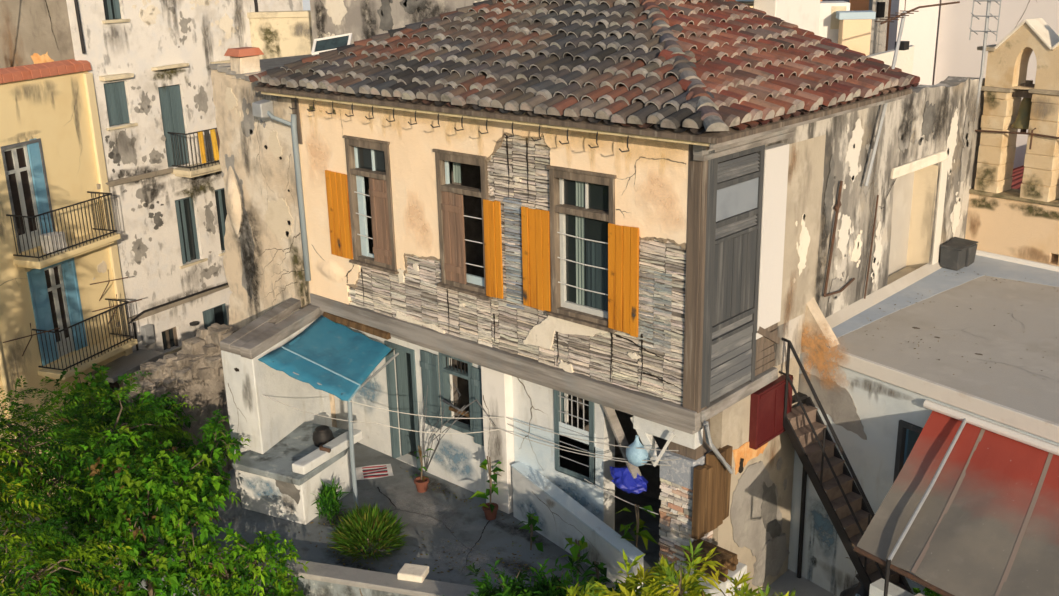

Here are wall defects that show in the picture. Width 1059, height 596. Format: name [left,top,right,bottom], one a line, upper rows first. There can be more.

peeling [317,0,347,38]
peeling [372,0,432,31]
water stain [156,68,184,79]
mould [109,167,164,198]
water stain [182,171,222,198]
crack [616,156,686,215]
peeling [823,119,882,303]
water stain [972,197,997,209]
water stain [1021,205,1059,219]
peeling [793,213,810,283]
peeling [798,328,867,440]
crack [483,378,600,555]